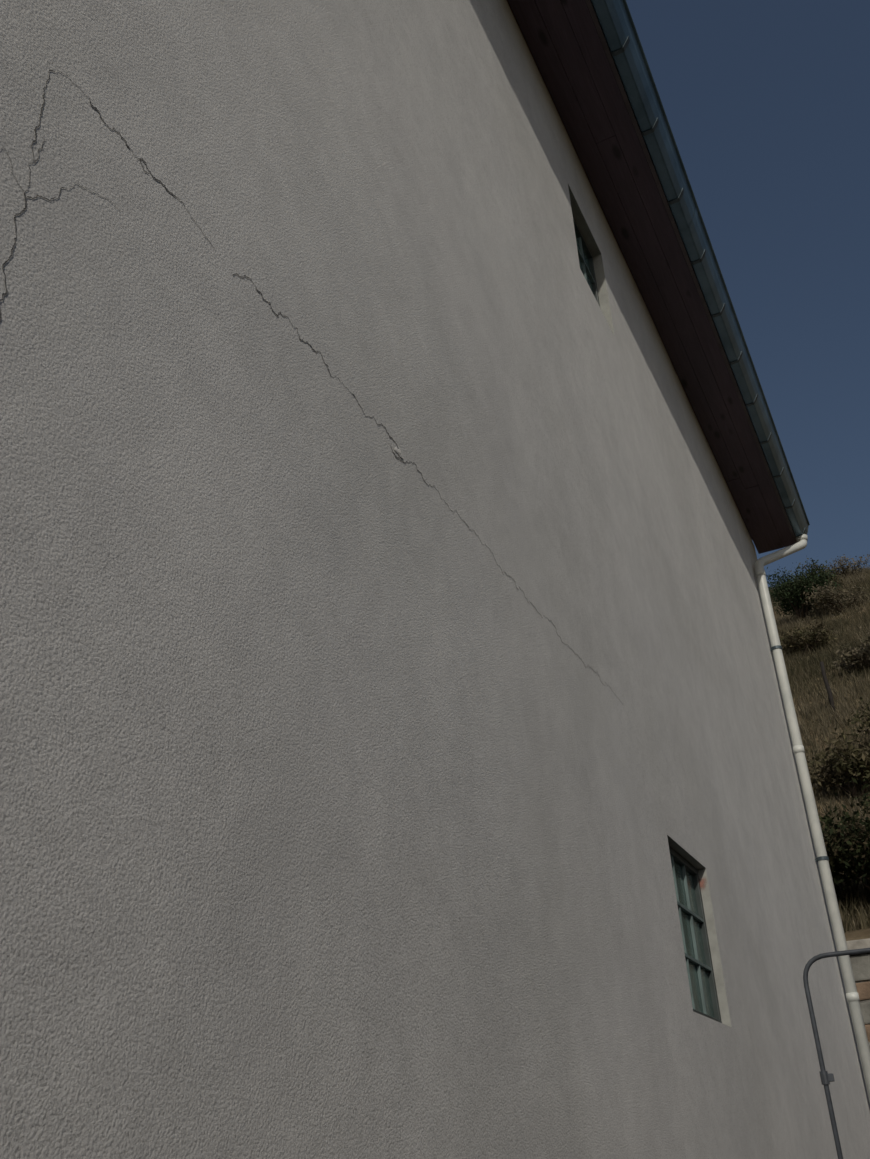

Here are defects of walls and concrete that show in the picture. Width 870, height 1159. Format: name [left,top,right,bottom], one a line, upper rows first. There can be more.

crack [0,70,216,321]
crack [233,273,623,705]